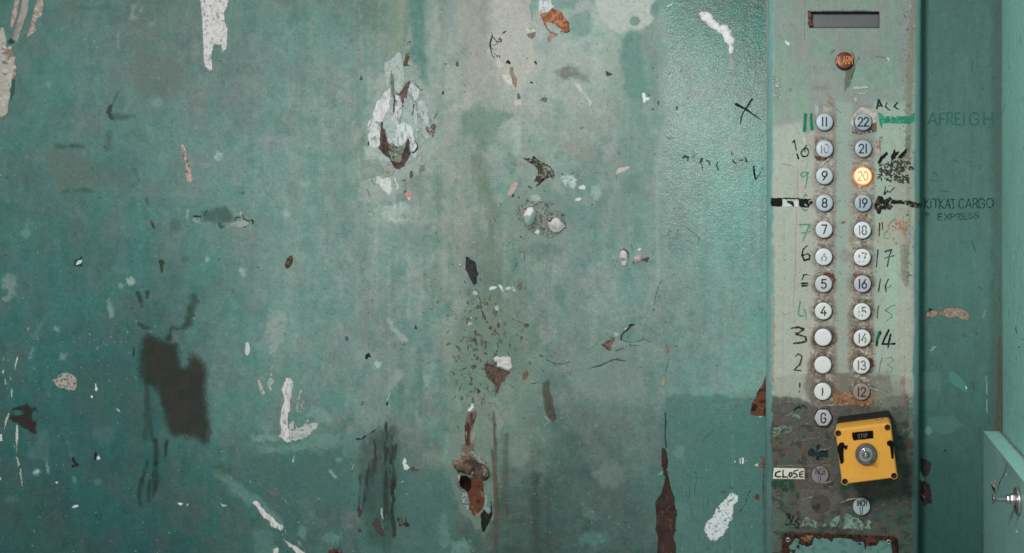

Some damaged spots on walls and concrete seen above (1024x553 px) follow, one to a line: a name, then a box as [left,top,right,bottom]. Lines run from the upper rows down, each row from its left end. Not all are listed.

peeling [0,0,43,119]
peeling [200,0,228,71]
rust [529,0,570,42]
peeling [361,41,437,220]
spalling [507,182,566,238]
spalling [52,372,77,391]
water stain [139,306,208,465]
flaking render [279,375,322,443]
rust [750,376,766,420]
water stain [356,423,410,537]